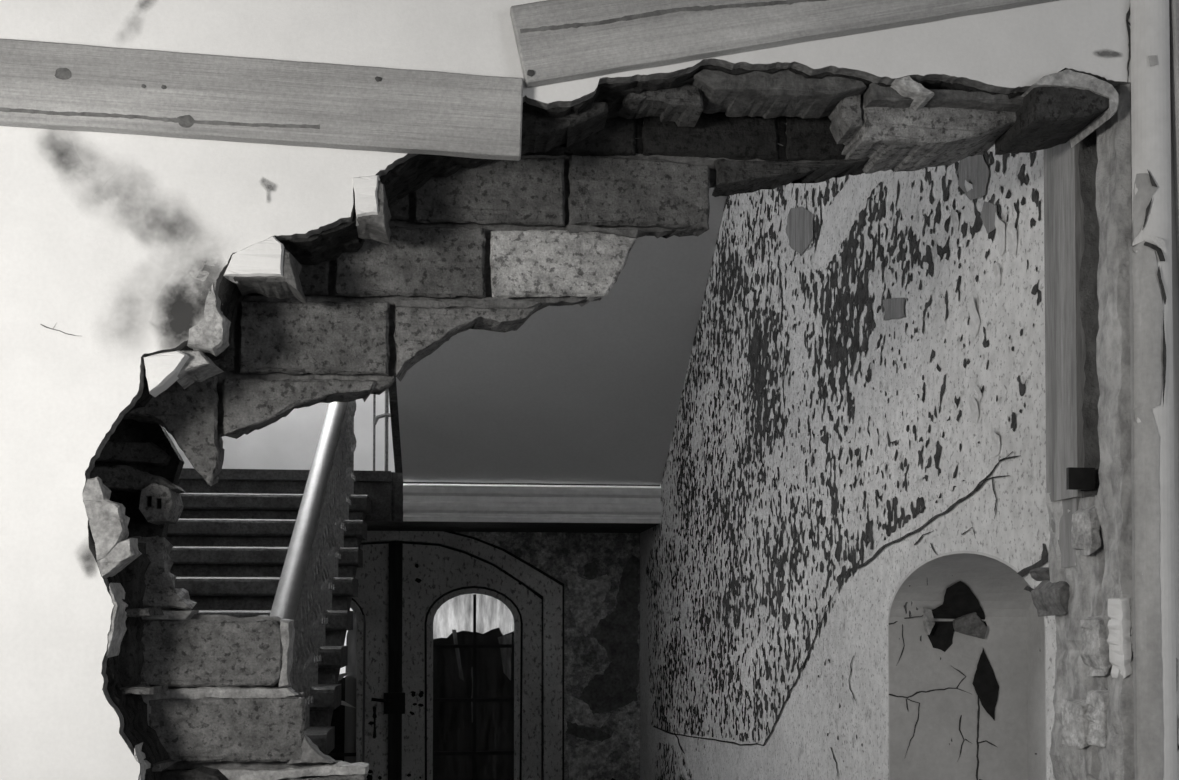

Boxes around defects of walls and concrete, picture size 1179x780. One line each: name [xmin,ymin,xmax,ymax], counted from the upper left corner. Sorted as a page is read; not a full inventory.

flaking render [82,69,1119,743]
peeling [1061,169,1166,780]
flaking render [134,696,306,780]
flaking render [282,769,382,780]
flaking render [566,555,643,780]
peeling [655,742,699,780]
crack [653,451,1021,754]
crack [889,667,997,780]